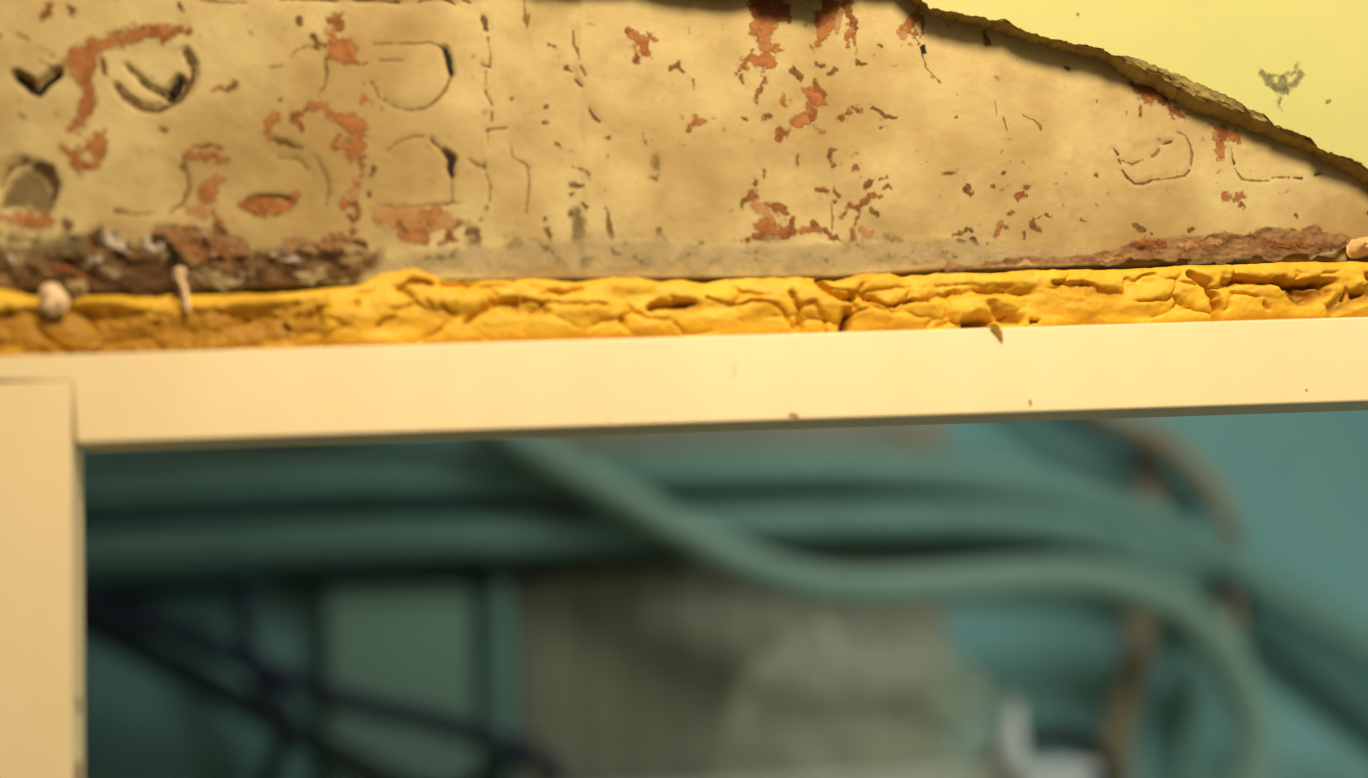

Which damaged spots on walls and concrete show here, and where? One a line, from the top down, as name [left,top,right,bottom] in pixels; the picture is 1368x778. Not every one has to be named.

crack [202,0,247,8]
crack [270,45,329,96]
crack [303,0,531,212]
crack [564,30,601,123]
flaking render [0,0,1368,297]
crack [1114,131,1193,184]